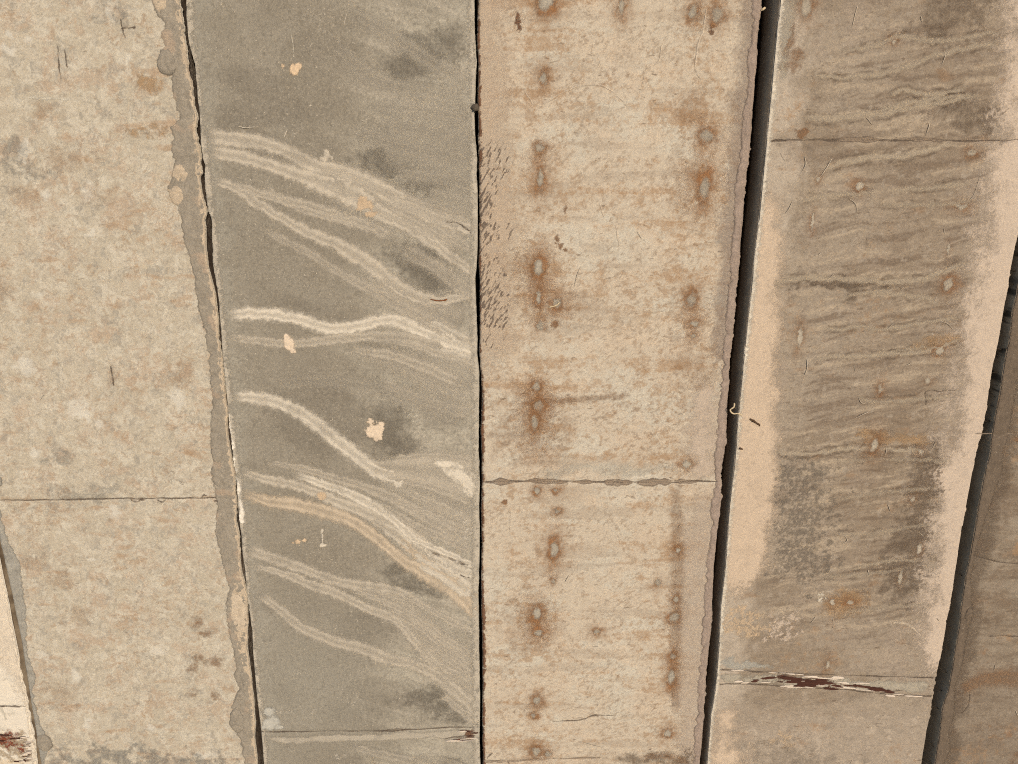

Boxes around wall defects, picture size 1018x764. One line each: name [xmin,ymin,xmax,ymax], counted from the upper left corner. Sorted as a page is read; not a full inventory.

corrosion [535,0,557,17]
corrosion [708,4,726,35]
corrosion [695,165,713,214]
corrosion [529,254,562,328]
corrosion [683,287,700,329]
leakage [812,0,1018,676]
corrosion [529,380,549,434]
leakage [725,191,955,600]
corrosion [546,535,562,563]
corrosion [529,605,546,637]
peeling [0,568,37,764]
spalling [731,670,922,697]